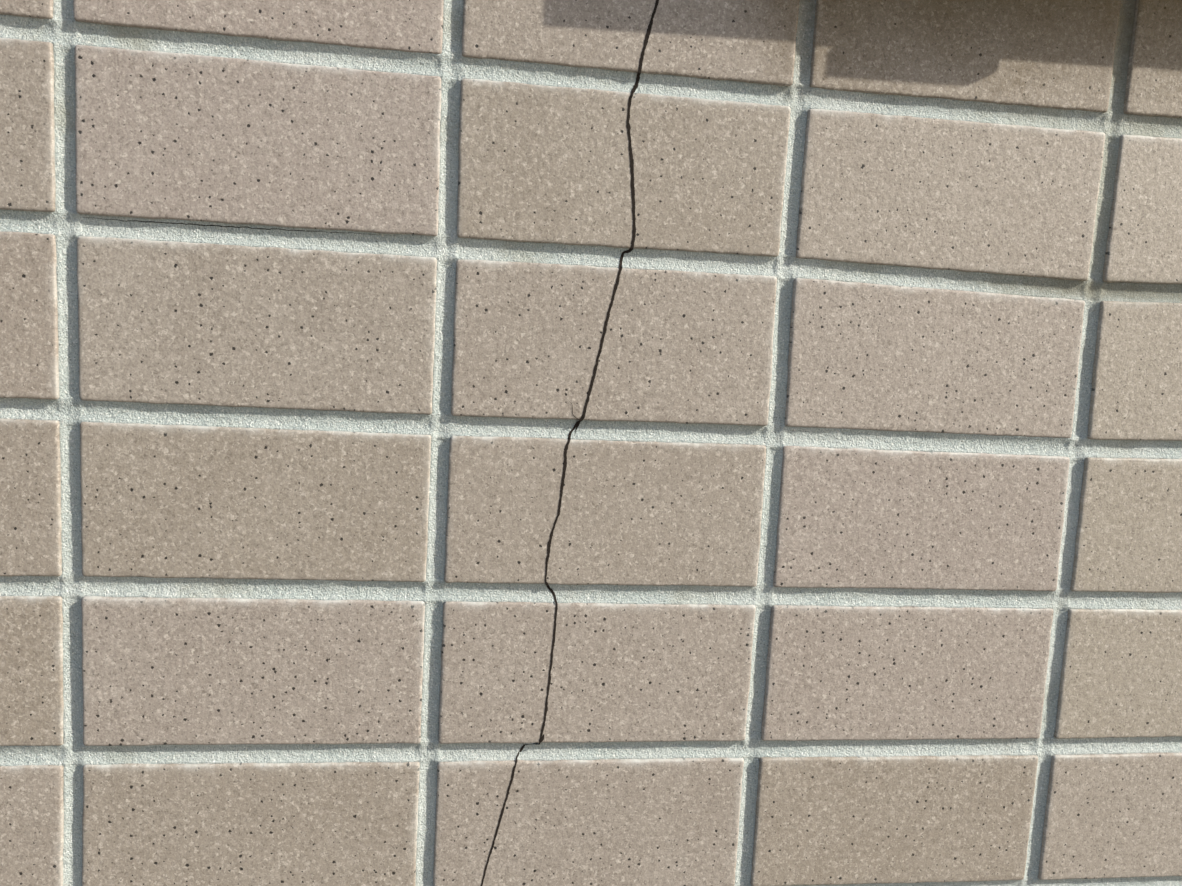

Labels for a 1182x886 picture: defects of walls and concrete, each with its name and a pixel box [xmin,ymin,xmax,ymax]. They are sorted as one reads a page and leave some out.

crack [481,0,659,886]